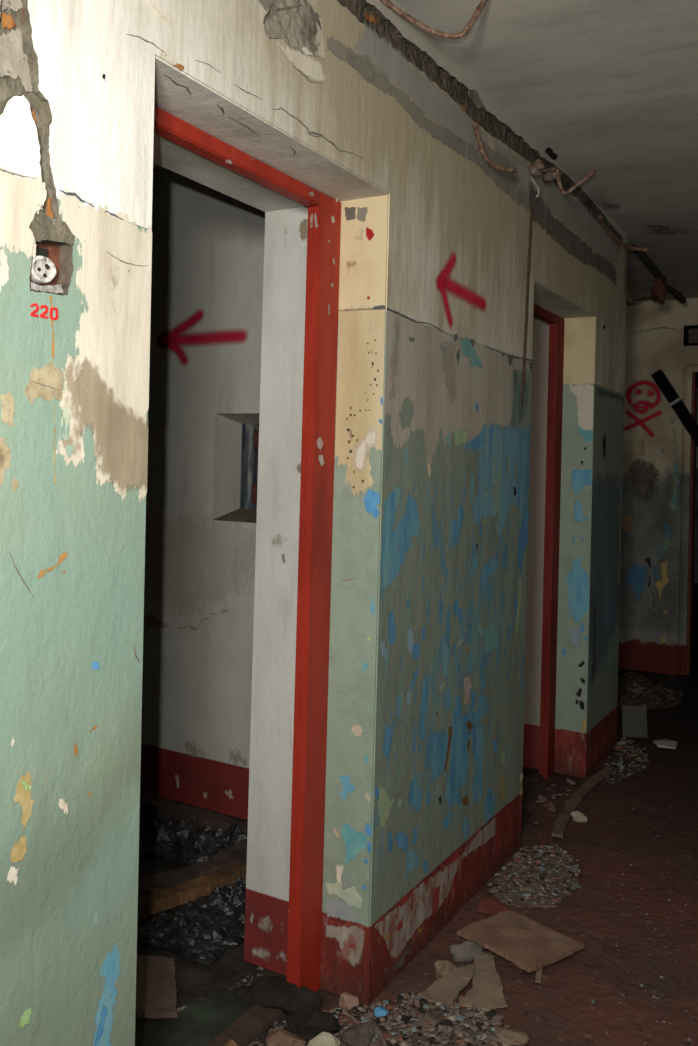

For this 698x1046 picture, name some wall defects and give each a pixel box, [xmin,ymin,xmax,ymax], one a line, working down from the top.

crack [126,34,191,95]
crack [196,60,364,159]
flaking render [263,0,326,83]
peeling [0,165,152,501]
peeling [317,304,533,635]
peeling [562,383,680,733]
peeling [325,582,506,969]
peeling [7,772,34,885]
peeling [93,944,121,1046]
peeling [252,948,286,960]
peeling [250,911,289,932]